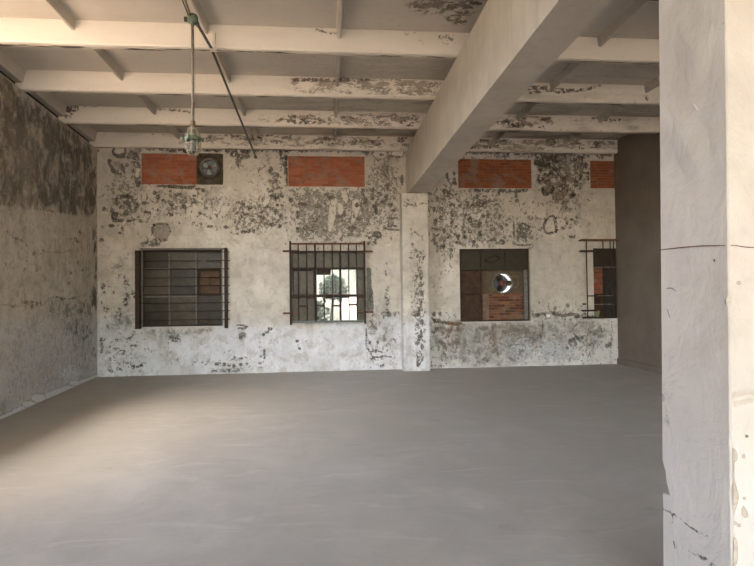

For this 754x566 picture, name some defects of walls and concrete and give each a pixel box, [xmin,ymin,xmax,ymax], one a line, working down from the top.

peeling [407,0,481,25]
peeling [292,78,438,95]
peeling [277,113,419,127]
peeling [496,116,552,128]
water stain [0,77,96,215]
peeling [470,139,615,151]
peeling [102,148,213,235]
peeling [409,244,457,367]
peeling [533,309,594,320]